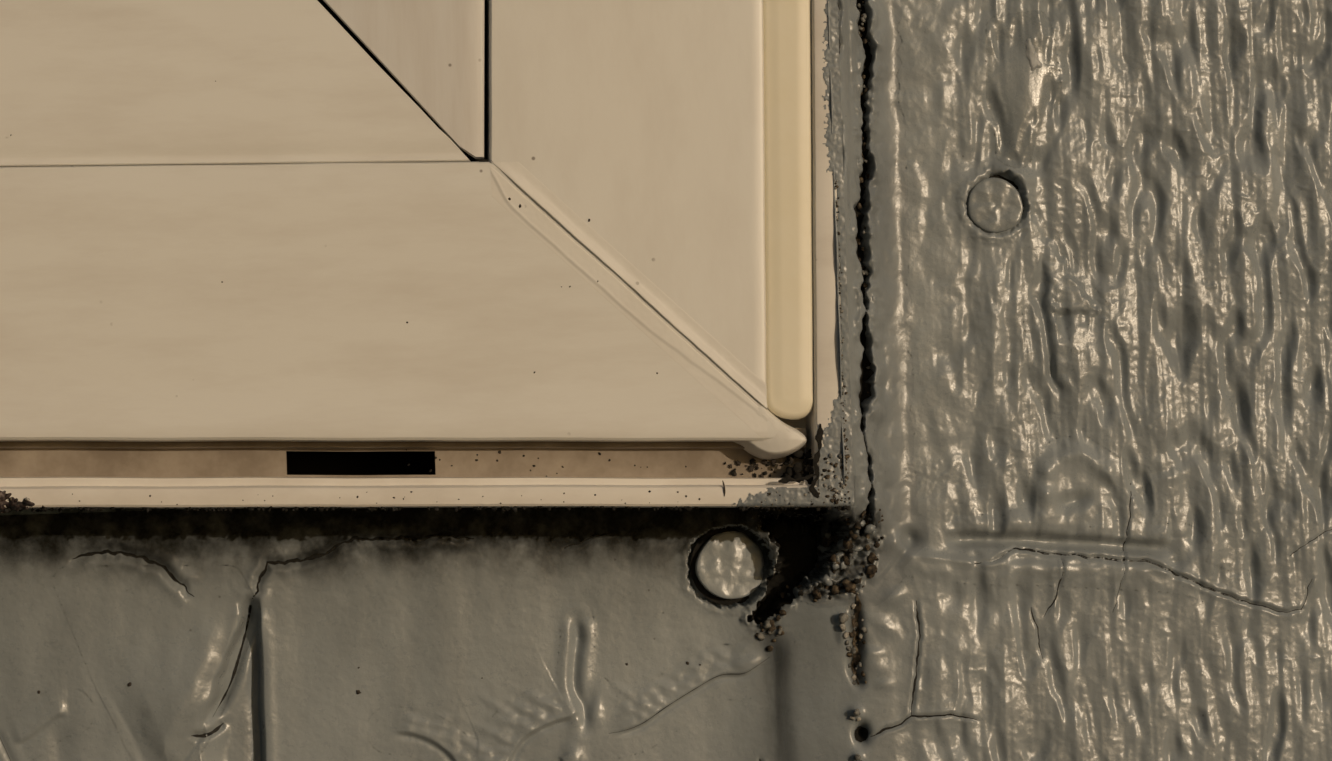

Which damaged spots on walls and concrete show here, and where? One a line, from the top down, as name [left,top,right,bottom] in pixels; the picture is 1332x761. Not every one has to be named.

crack [838,0,874,521]
crack [73,549,194,597]
crack [838,590,867,685]
crack [870,601,978,737]
crack [974,483,1312,658]